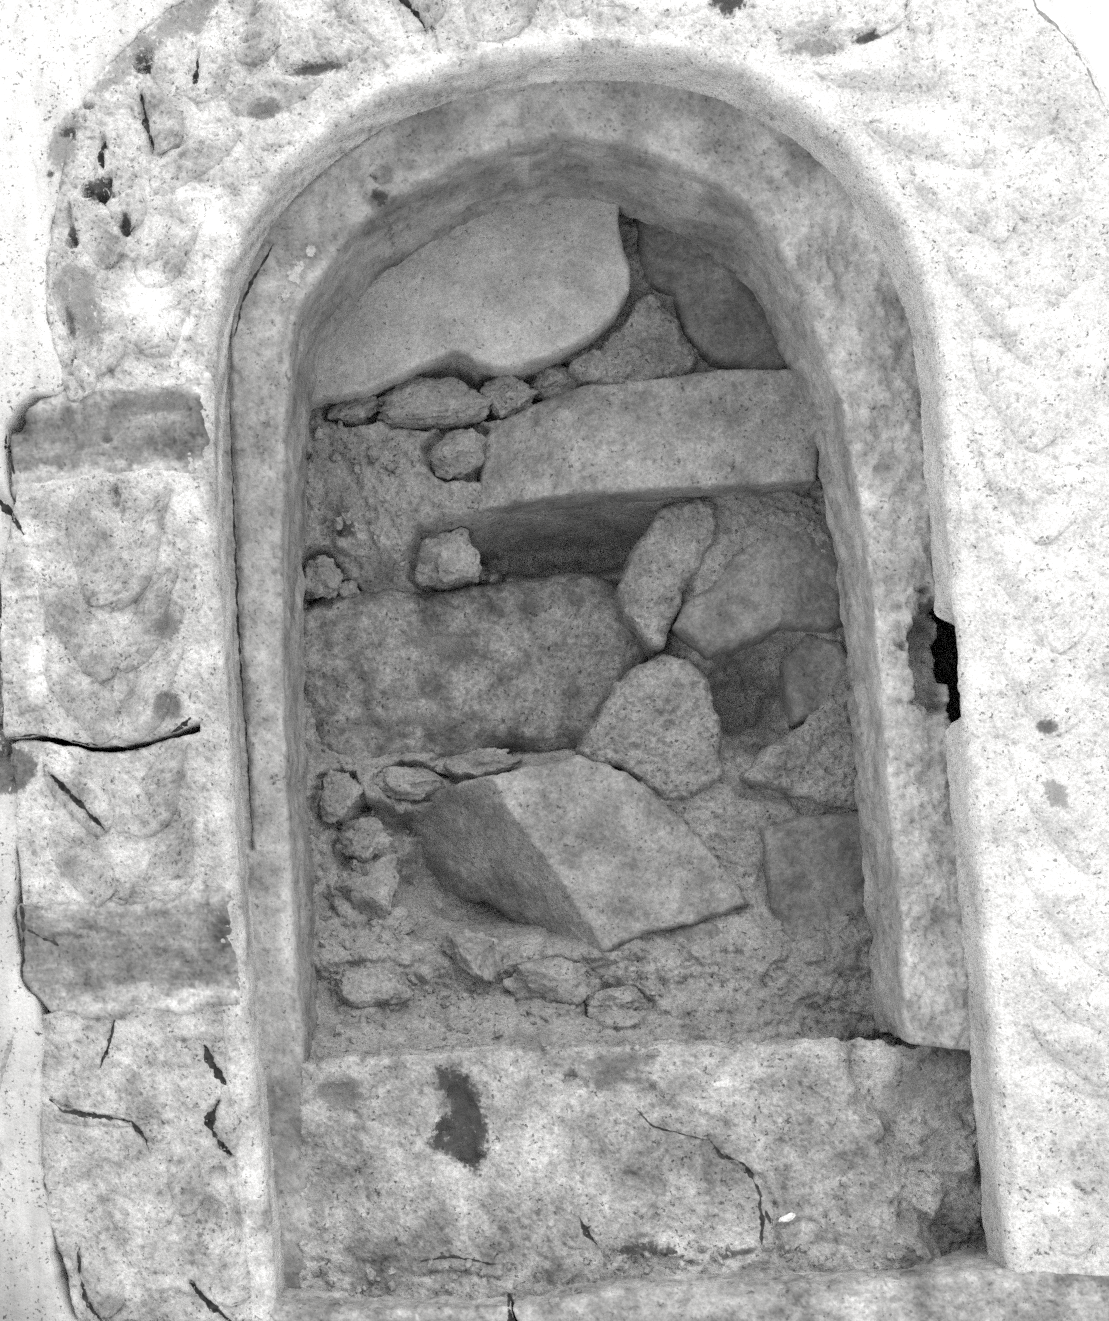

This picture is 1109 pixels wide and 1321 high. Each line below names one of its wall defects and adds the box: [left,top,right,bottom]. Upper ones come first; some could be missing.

crack [0,582,200,753]
flaking render [0,672,37,794]
crack [421,1255,496,1265]
crack [507,1293,518,1321]